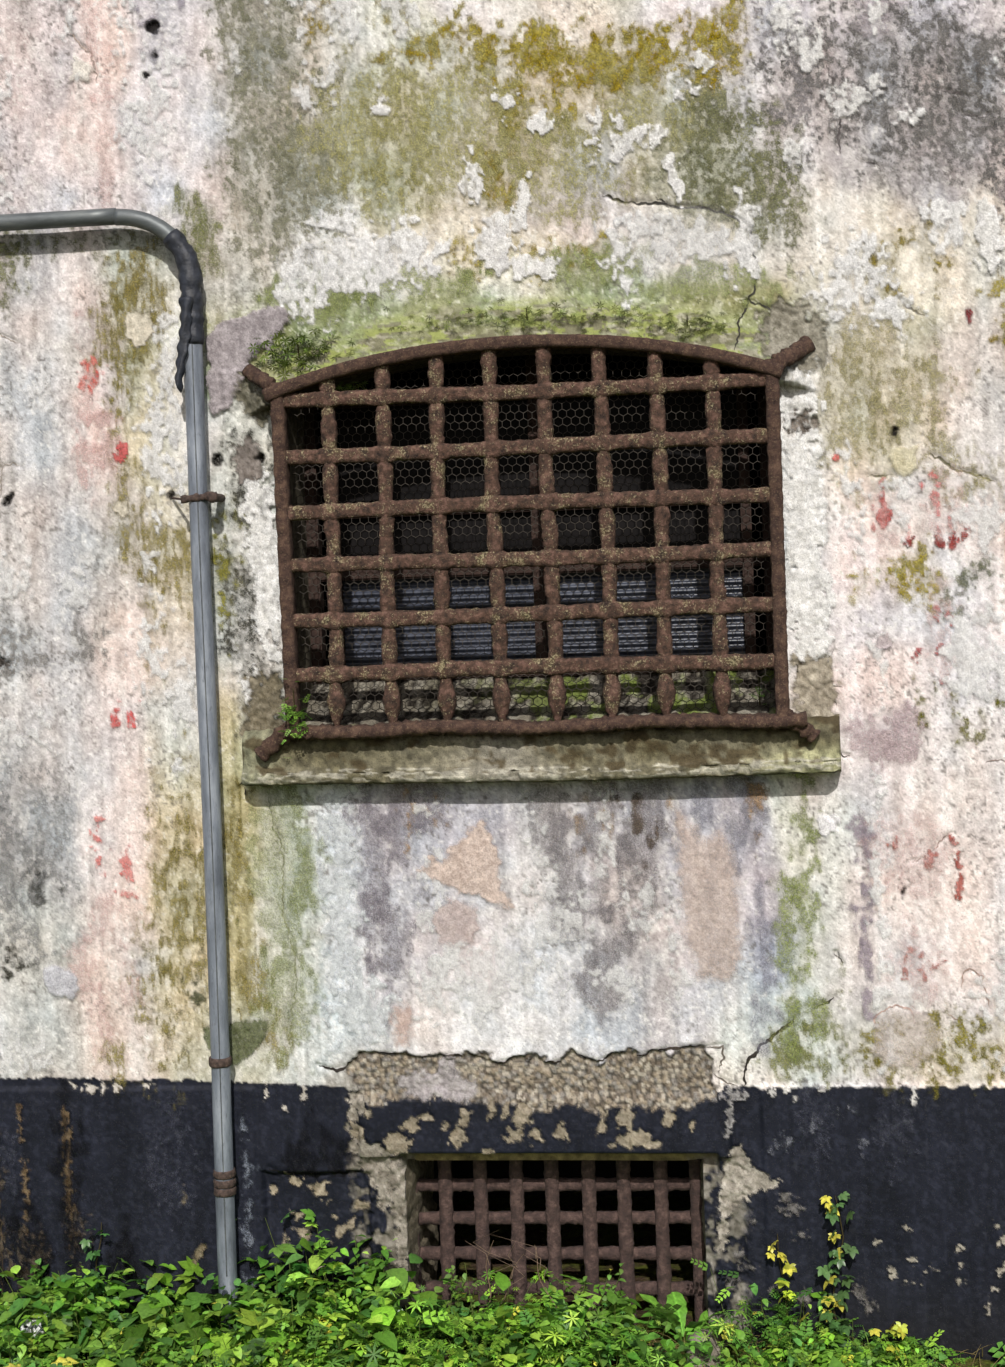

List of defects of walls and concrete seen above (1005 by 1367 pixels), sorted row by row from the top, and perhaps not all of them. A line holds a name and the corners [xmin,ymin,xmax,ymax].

peeling [673,49,715,101]
peeling [491,87,519,126]
peeling [527,108,554,135]
peeling [457,145,560,285]
peeling [584,105,761,310]
crack [602,194,771,350]
leakage [180,978,206,1012]
spalling [326,811,805,1287]
peeling [769,1084,830,1176]
peeling [270,1172,330,1195]
peeling [283,1212,312,1244]
peeling [852,1284,879,1313]